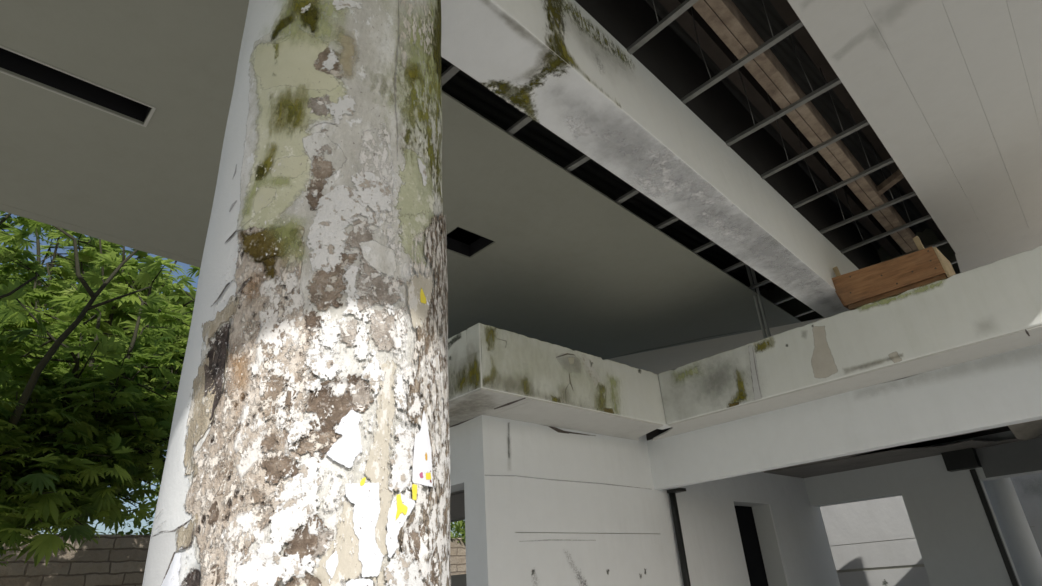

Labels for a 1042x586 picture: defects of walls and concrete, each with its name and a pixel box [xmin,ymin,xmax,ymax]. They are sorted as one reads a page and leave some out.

damp [271,5,318,58]
damp [560,40,578,67]
damp [488,86,532,113]
damp [407,127,439,184]
flaking render [143,0,451,586]
peeling [811,326,838,378]
damp [429,311,480,492]
damp [599,378,617,414]